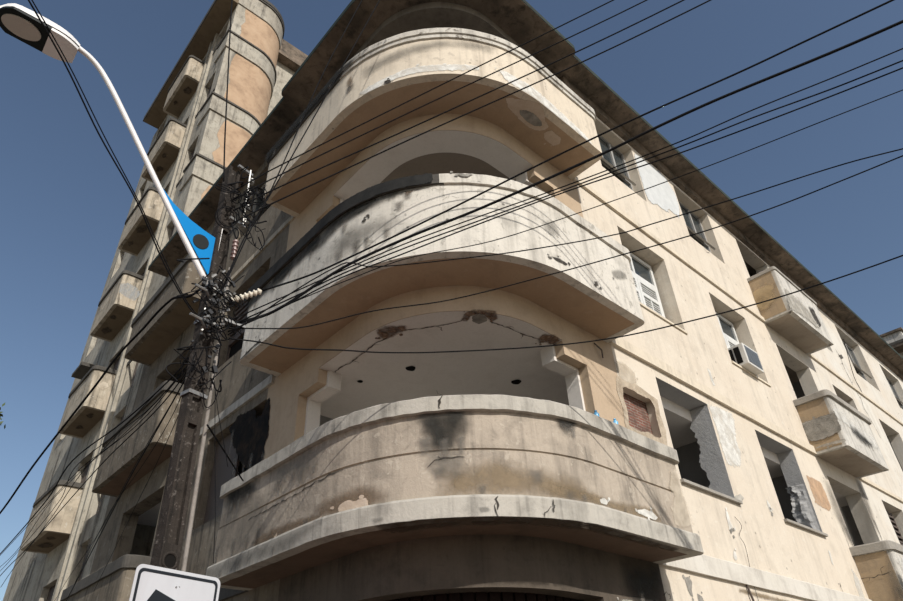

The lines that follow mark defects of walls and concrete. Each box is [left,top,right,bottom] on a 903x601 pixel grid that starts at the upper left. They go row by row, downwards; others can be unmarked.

flaking render [462,310,497,324]
flaking render [375,326,407,339]
flaking render [535,334,560,345]
crack [335,338,387,372]
water stain [420,411,466,451]
water stain [559,419,576,436]
flaking render [690,404,744,507]
flaking render [330,495,368,512]
peeling [635,508,658,520]